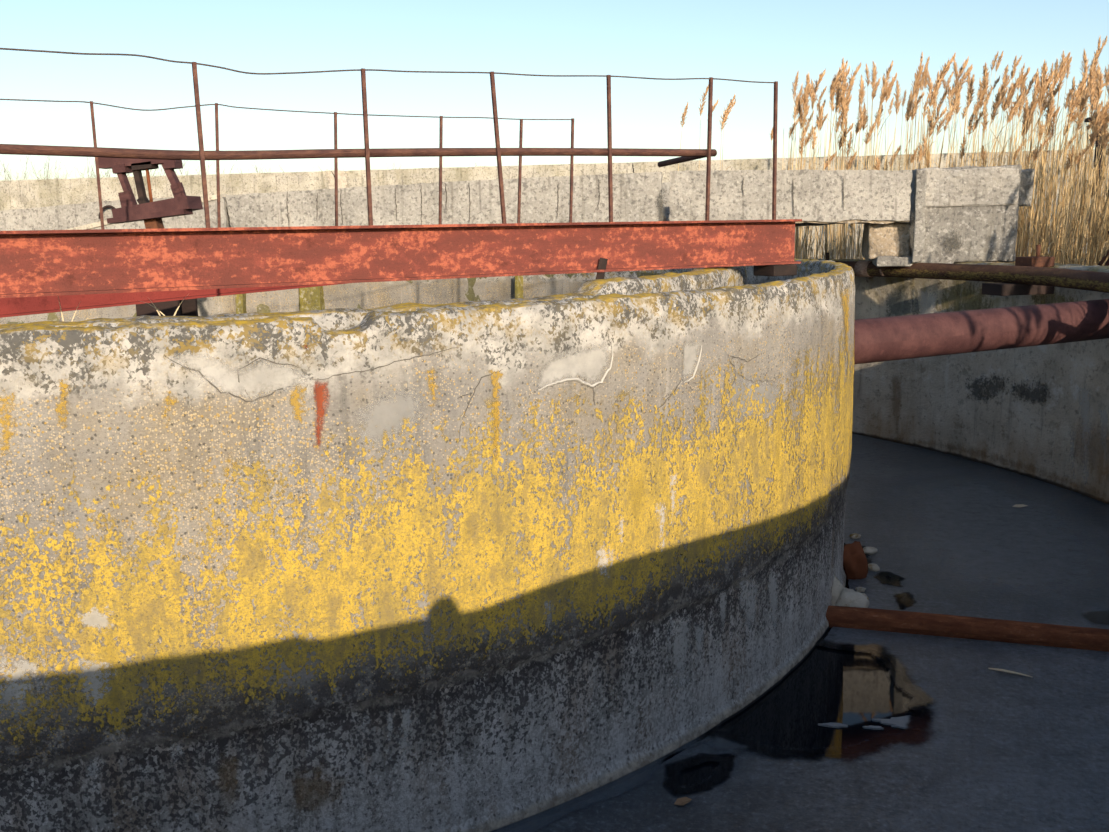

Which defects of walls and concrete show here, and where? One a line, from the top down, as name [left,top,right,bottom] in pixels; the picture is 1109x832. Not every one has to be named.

crack [165,348,451,402]
corrosion [314,383,328,444]
water stain [965,373,1050,403]
water stain [78,607,114,628]
water stain [0,659,48,717]
water stain [77,659,116,705]
water stain [387,710,412,761]